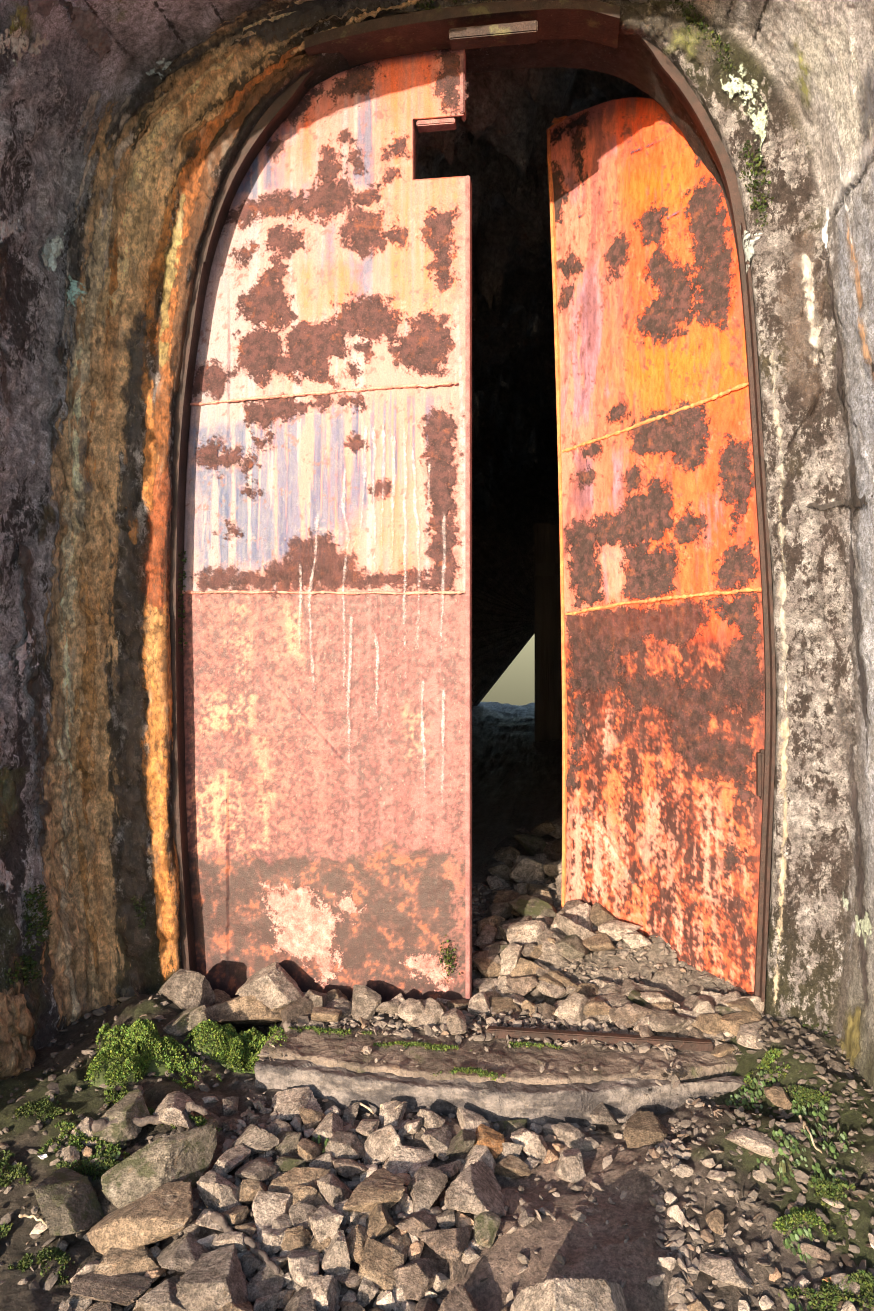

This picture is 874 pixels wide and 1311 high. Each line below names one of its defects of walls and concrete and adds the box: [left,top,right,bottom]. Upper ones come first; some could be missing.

rust [39,0,315,1026]